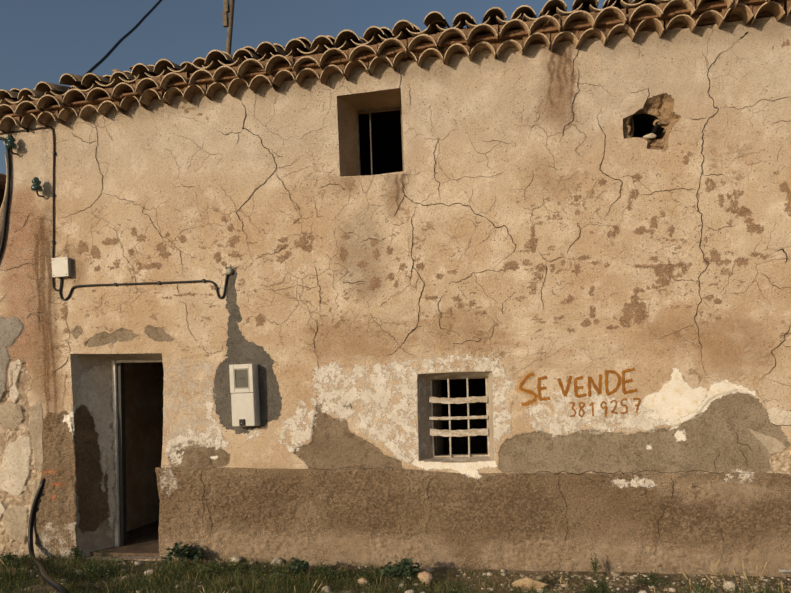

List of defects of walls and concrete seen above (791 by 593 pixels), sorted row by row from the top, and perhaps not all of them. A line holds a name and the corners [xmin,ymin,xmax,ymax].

crack [5,125,216,274]
crack [218,97,355,271]
crack [358,105,516,362]
spalling [623,93,681,150]
crack [539,32,785,381]
spalling [0,359,116,559]
spalling [60,301,175,347]
crack [271,255,365,367]
spalling [278,351,791,505]
crack [762,327,790,378]